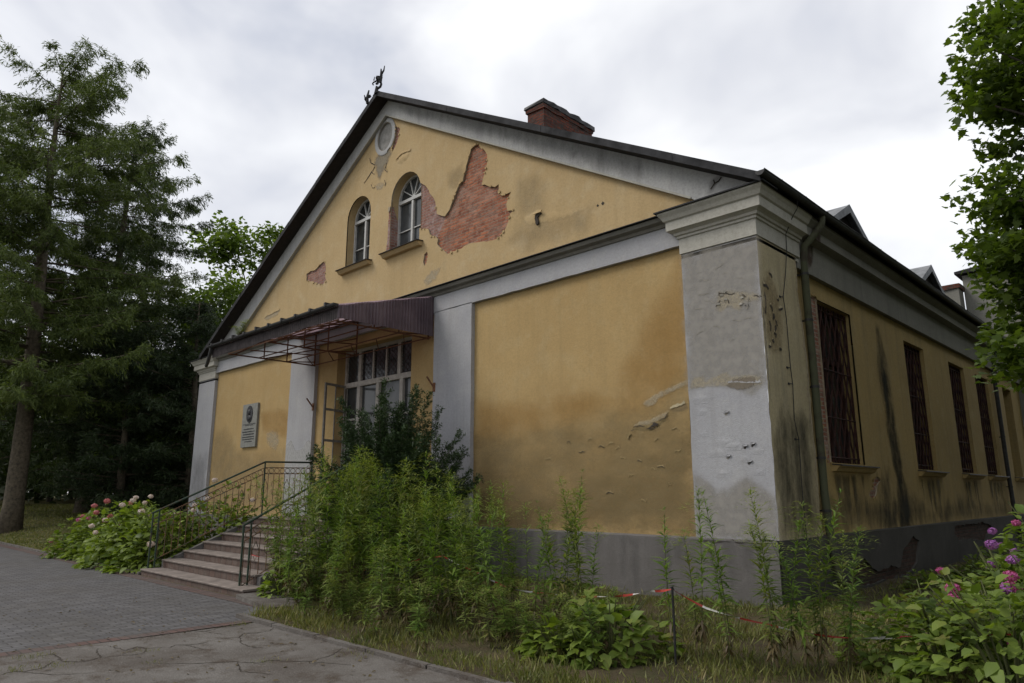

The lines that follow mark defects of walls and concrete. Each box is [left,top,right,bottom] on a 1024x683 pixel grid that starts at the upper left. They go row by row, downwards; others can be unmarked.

spalling [306,261,326,285]
spalling [371,126,411,251]
spalling [420,143,514,283]
peeling [645,376,760,405]
water stain [858,346,921,525]
spalling [954,522,992,541]